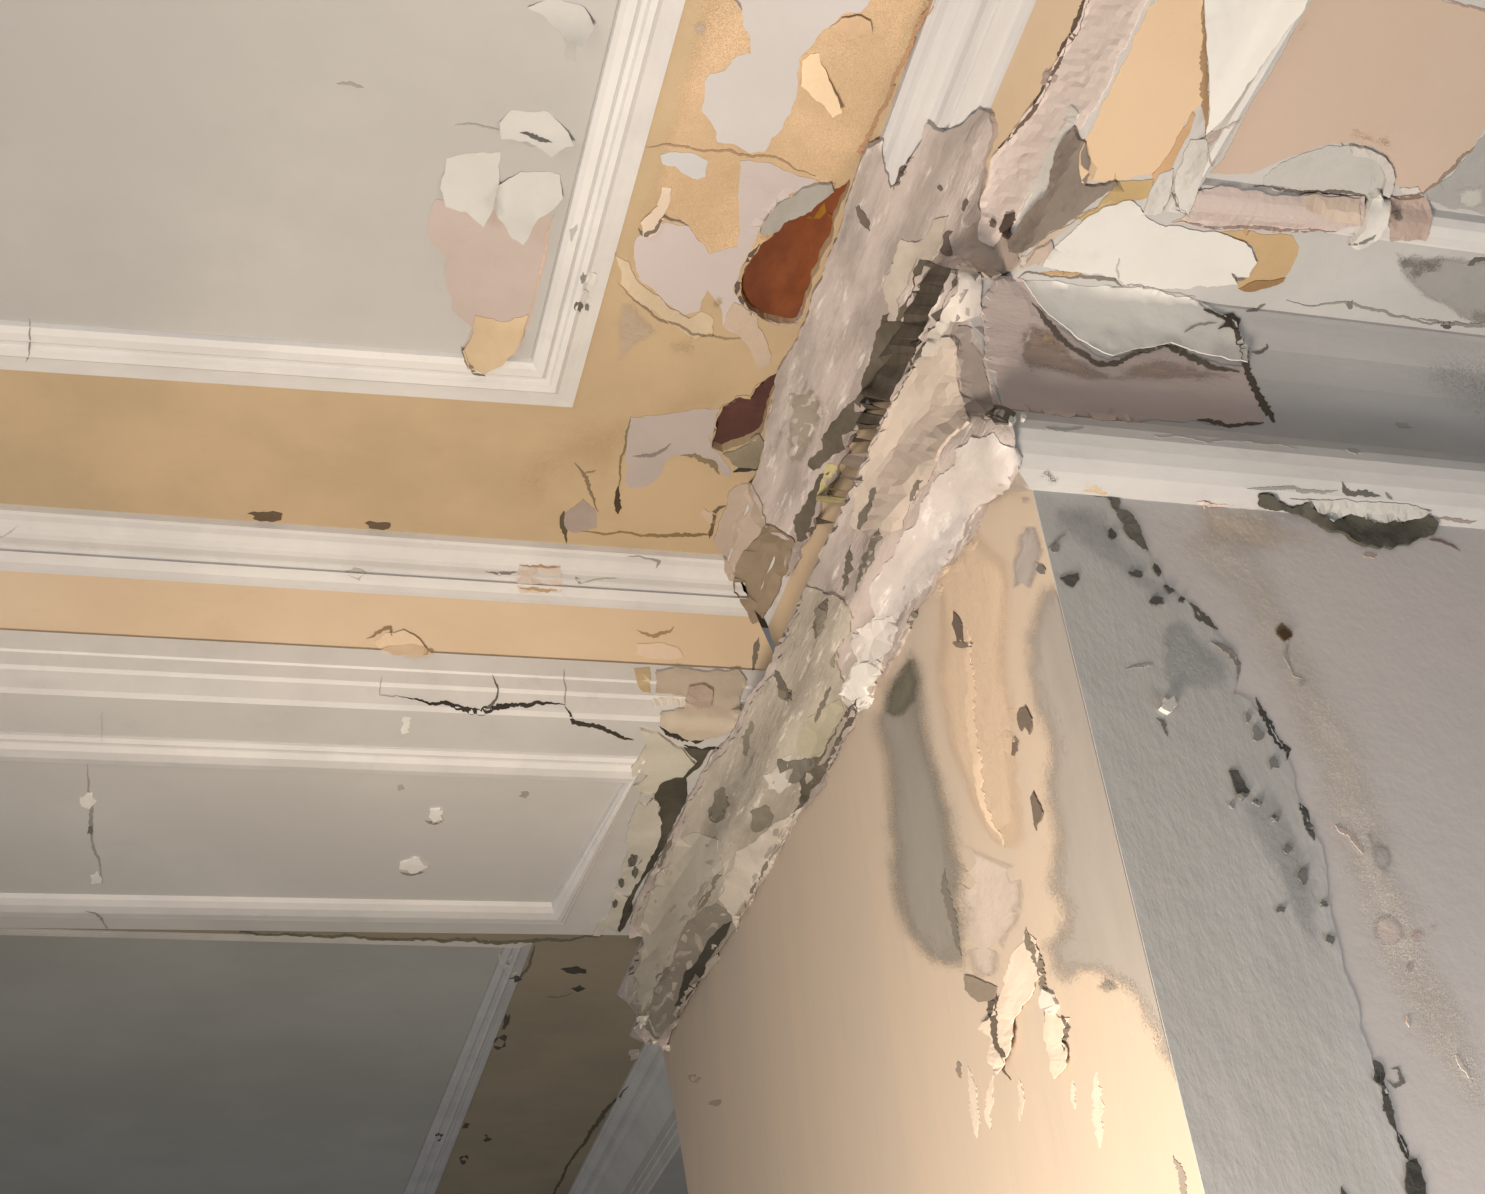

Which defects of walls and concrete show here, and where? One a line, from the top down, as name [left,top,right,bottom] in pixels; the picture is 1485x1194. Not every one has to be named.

peeling [528,0,594,62]
peeling [427,110,574,376]
crack [80,712,108,929]
peeling [367,626,433,657]
crack [379,672,722,750]
flaking render [560,0,1485,1080]
flaking render [1032,490,1410,1194]
damp [1107,482,1485,1118]